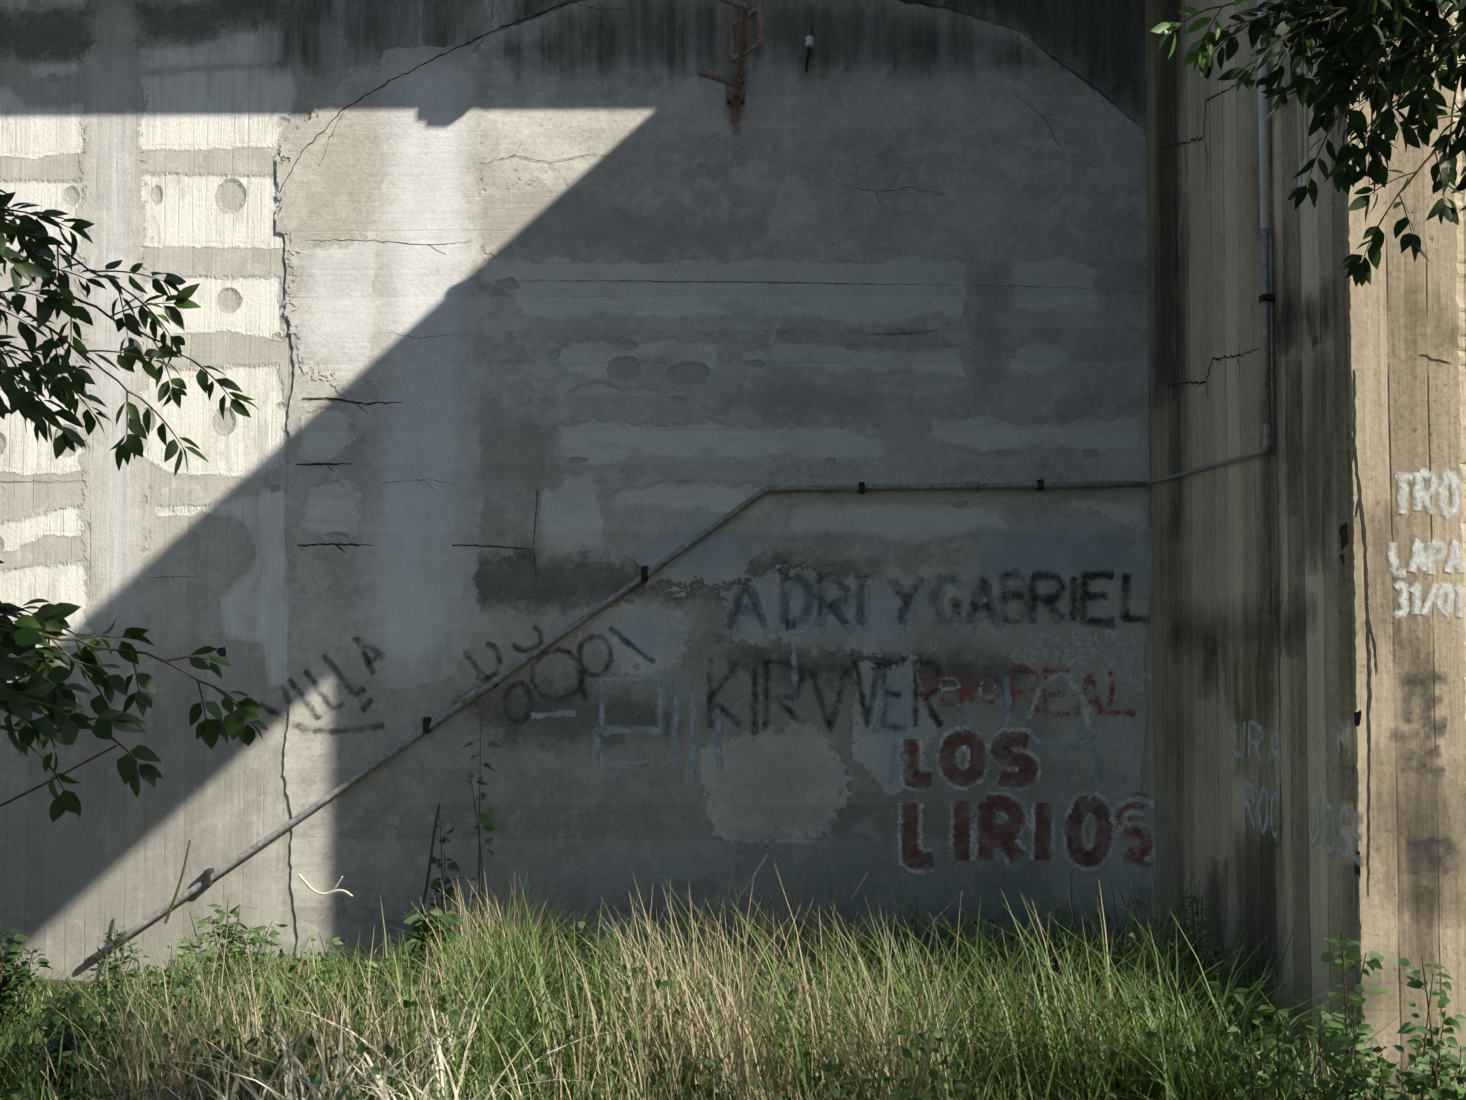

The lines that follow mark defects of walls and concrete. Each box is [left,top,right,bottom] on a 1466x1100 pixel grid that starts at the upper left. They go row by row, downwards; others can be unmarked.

crack [279,0,629,193]
crack [902,0,1244,190]
water stain [0,0,890,693]
crack [1166,347,1261,399]
crack [1353,369,1378,897]